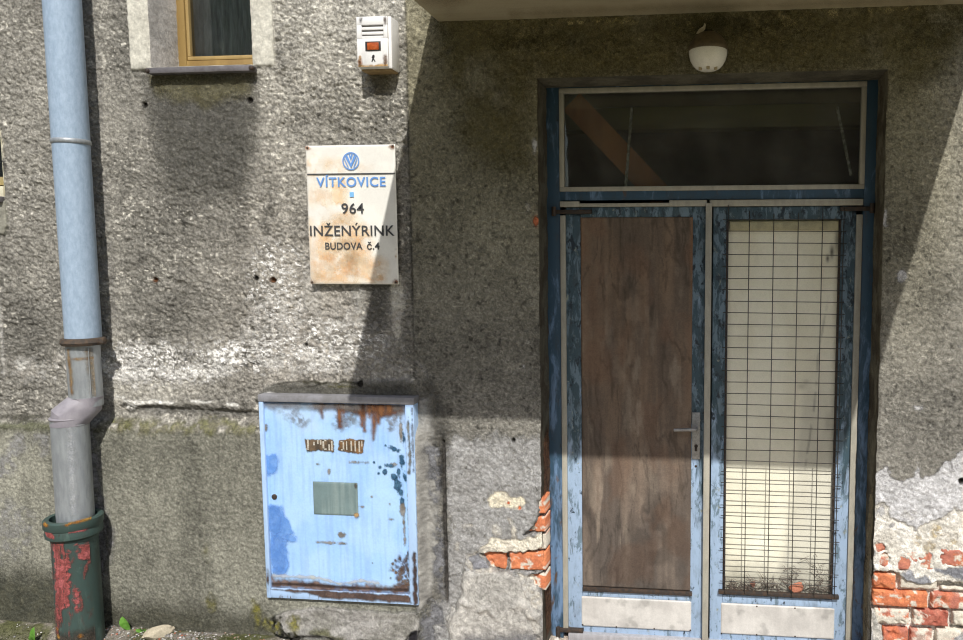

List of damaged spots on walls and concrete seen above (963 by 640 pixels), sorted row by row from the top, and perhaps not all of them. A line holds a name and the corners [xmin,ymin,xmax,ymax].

damp [149,73,256,188]
peeling [268,431,551,640]
spalling [863,450,963,640]